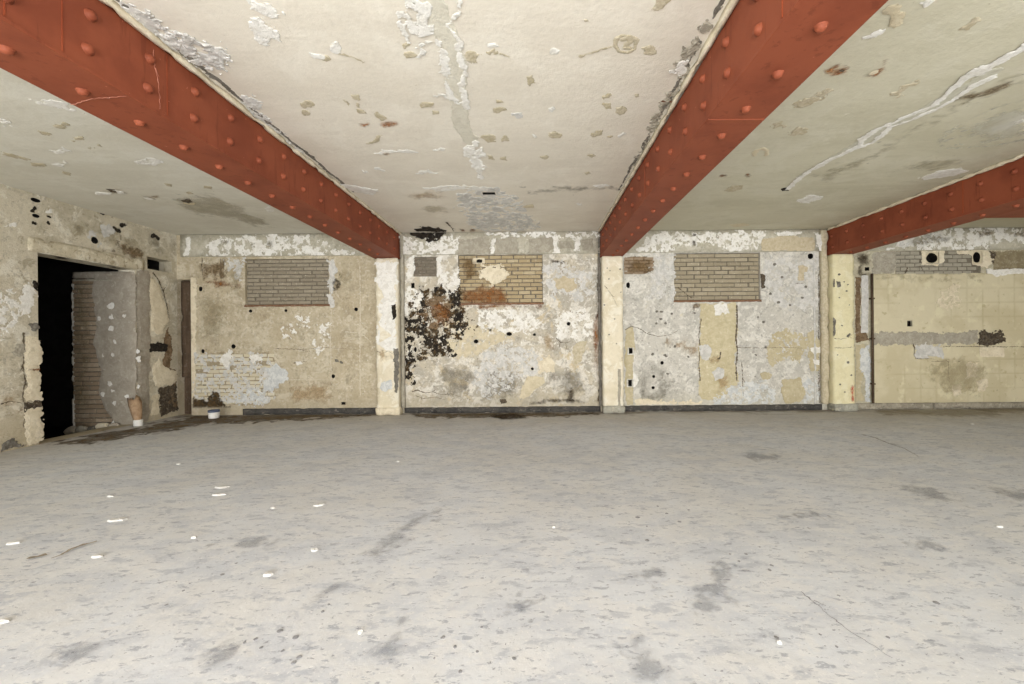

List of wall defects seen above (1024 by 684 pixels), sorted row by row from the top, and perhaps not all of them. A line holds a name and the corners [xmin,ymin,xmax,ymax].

spalling [116,0,378,195]
peeling [402,43,417,58]
peeling [464,43,499,64]
spalling [585,0,725,190]
crack [786,43,1024,190]
peeling [190,277,332,407]
peeling [205,234,355,308]
mould [404,283,478,386]
peeling [374,169,824,406]
spalling [833,266,1006,402]